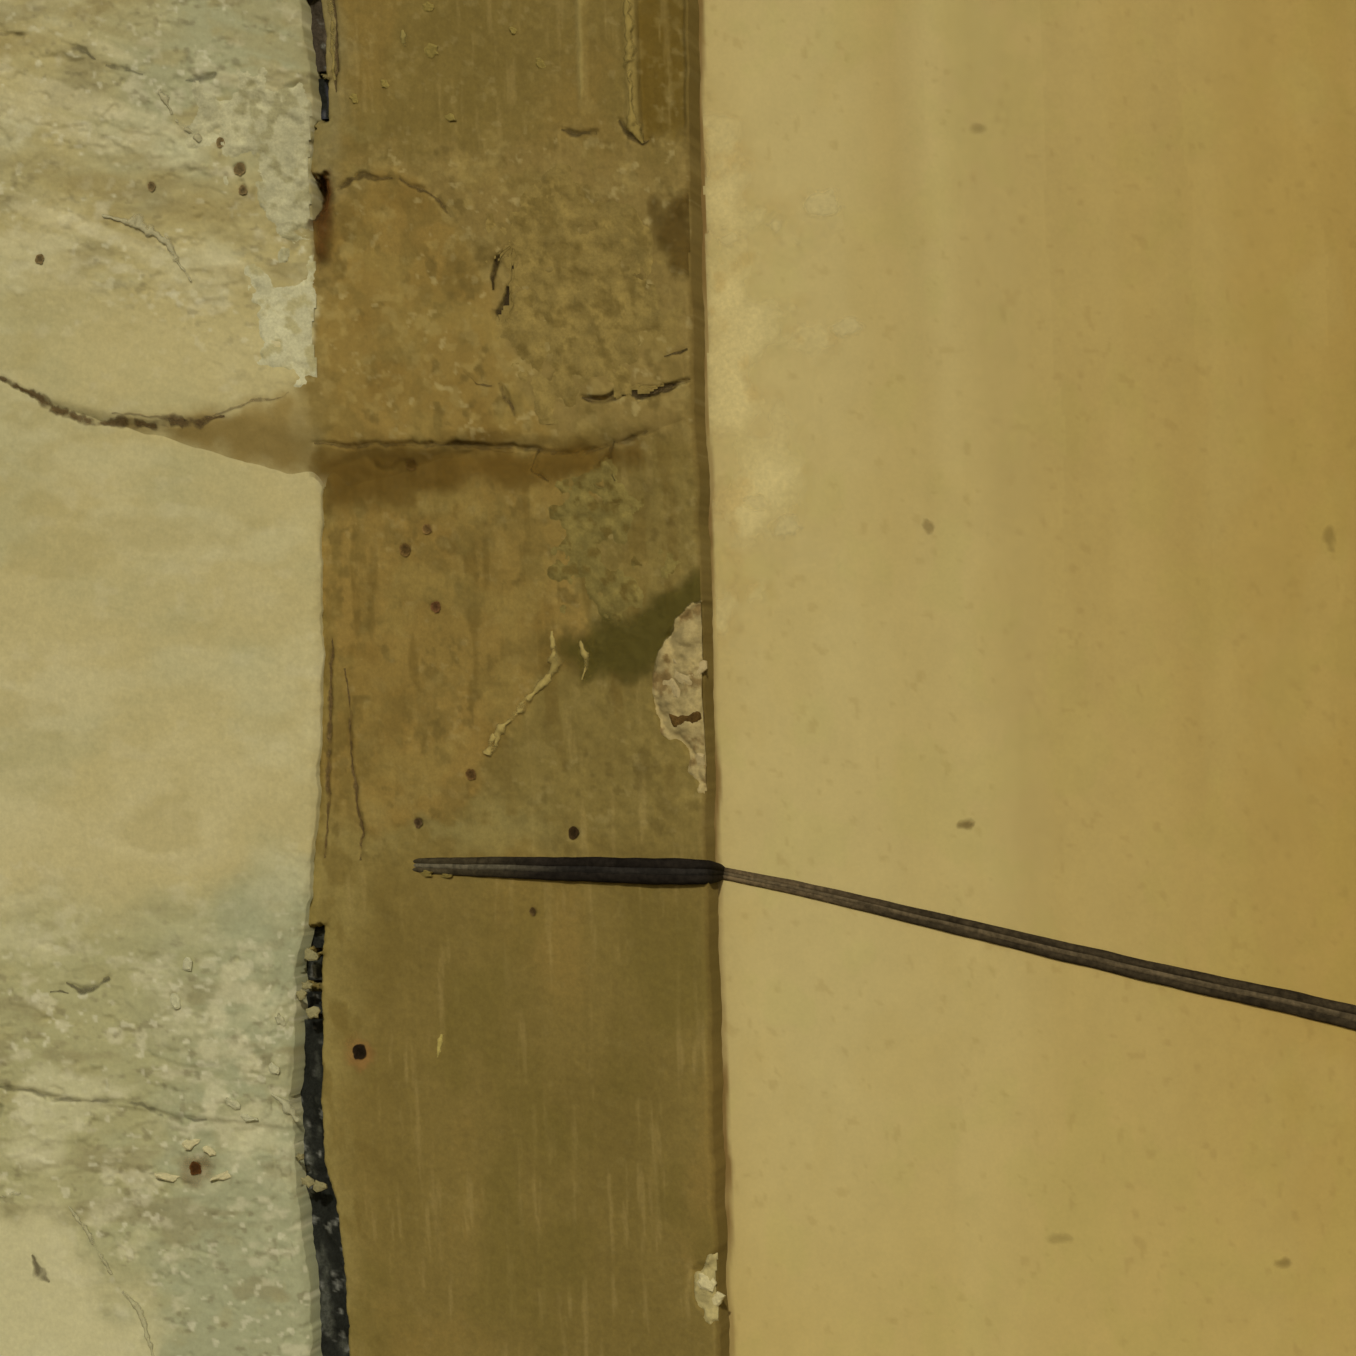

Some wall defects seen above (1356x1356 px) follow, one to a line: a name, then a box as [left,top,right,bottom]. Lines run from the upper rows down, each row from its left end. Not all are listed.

crack [341,173,445,208]
crack [491,246,515,315]
peeling [703,119,800,538]
crack [0,376,225,429]
crack [582,348,690,401]
spalling [652,600,731,794]
crack [296,925,350,1356]
spalling [694,1253,726,1324]